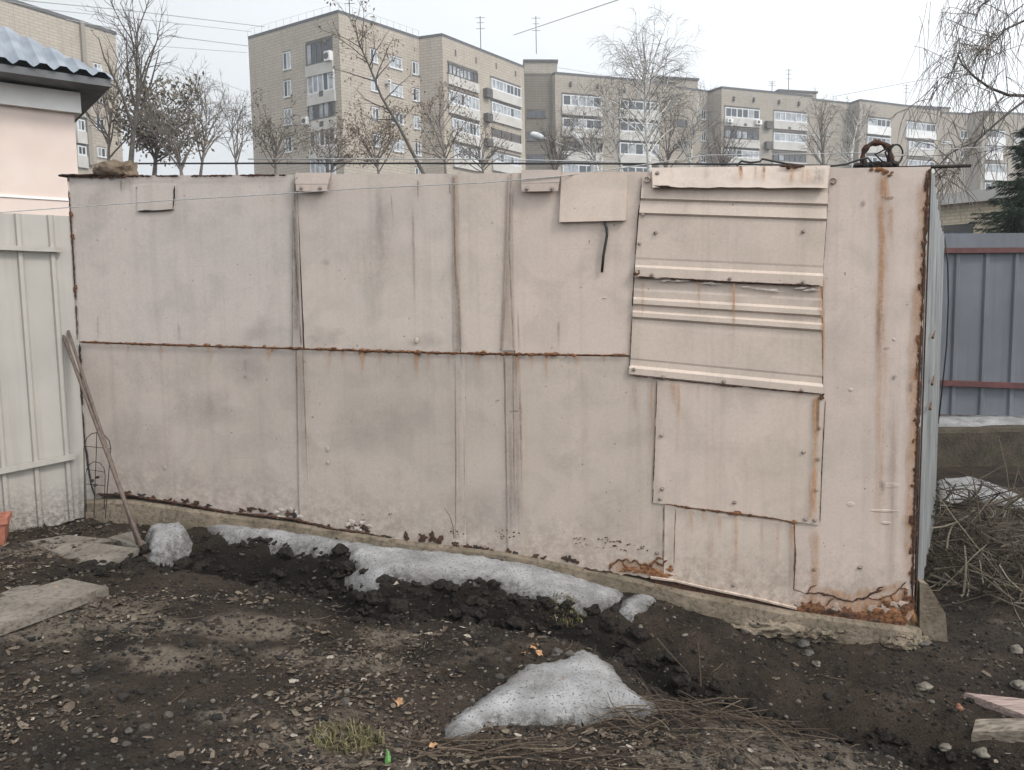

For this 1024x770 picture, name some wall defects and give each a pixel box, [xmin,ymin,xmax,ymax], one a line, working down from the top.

rust [67,174,627,554]
rust [561,537,648,573]
rust [632,375,824,508]
rust [666,167,931,626]